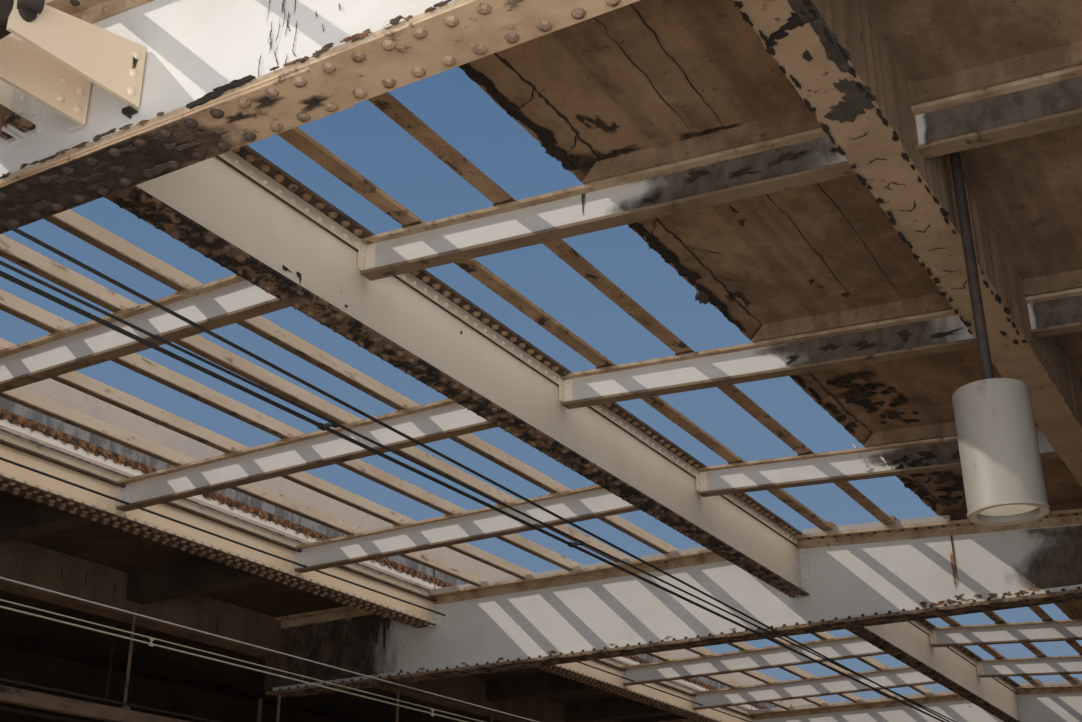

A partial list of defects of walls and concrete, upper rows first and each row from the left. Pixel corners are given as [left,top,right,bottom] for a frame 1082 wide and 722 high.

rust [0,112,164,179]
rust [186,75,256,109]
rust [228,96,280,123]
rust [302,97,327,111]
spalling [459,63,579,170]
crack [593,17,688,128]
crack [630,4,722,124]
peeling [735,0,972,335]
spalling [628,222,747,333]
crack [766,194,852,298]
crack [817,183,897,291]
peeling [790,372,966,511]